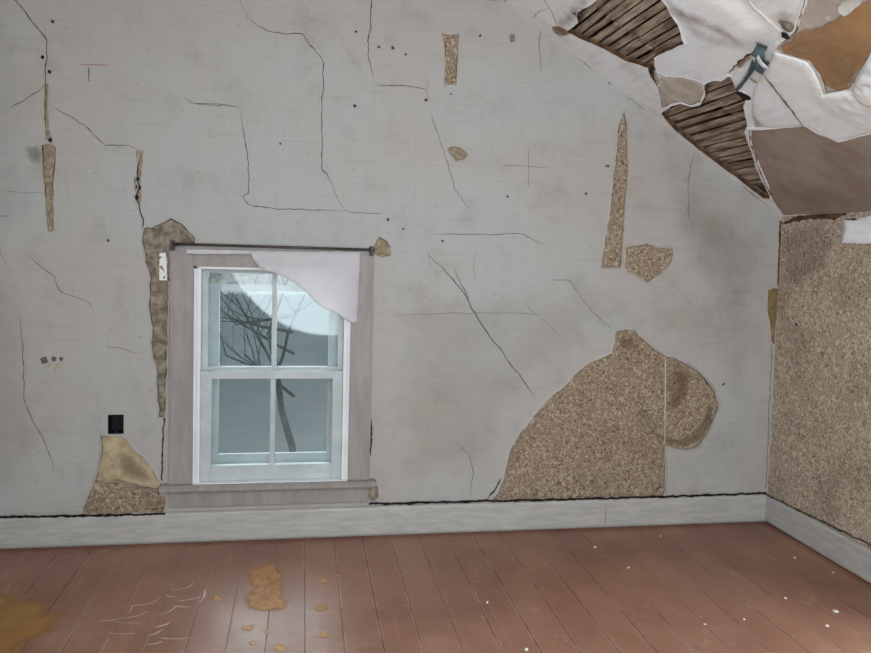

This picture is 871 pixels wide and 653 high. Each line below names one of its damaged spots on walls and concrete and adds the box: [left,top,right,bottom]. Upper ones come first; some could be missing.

crack [19,315,54,473]
crack [27,254,92,307]
crack [11,0,144,233]
flaking render [82,434,166,514]
flaking render [141,216,197,418]
crack [186,1,379,214]
peeling [441,33,460,86]
crack [367,0,538,242]
crack [410,257,557,396]
peeling [492,327,721,500]
peeling [600,111,674,284]
peeling [565,0,871,244]